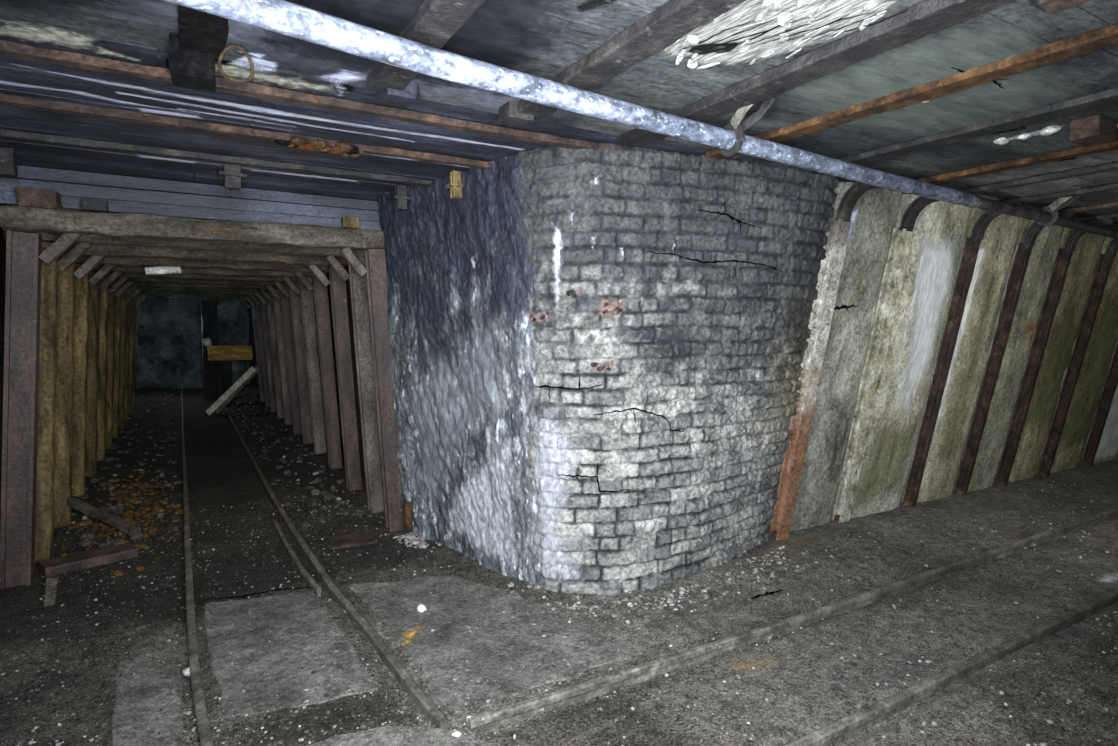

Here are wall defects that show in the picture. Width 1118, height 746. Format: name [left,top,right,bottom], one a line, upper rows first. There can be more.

corrosion [274,136,365,158]